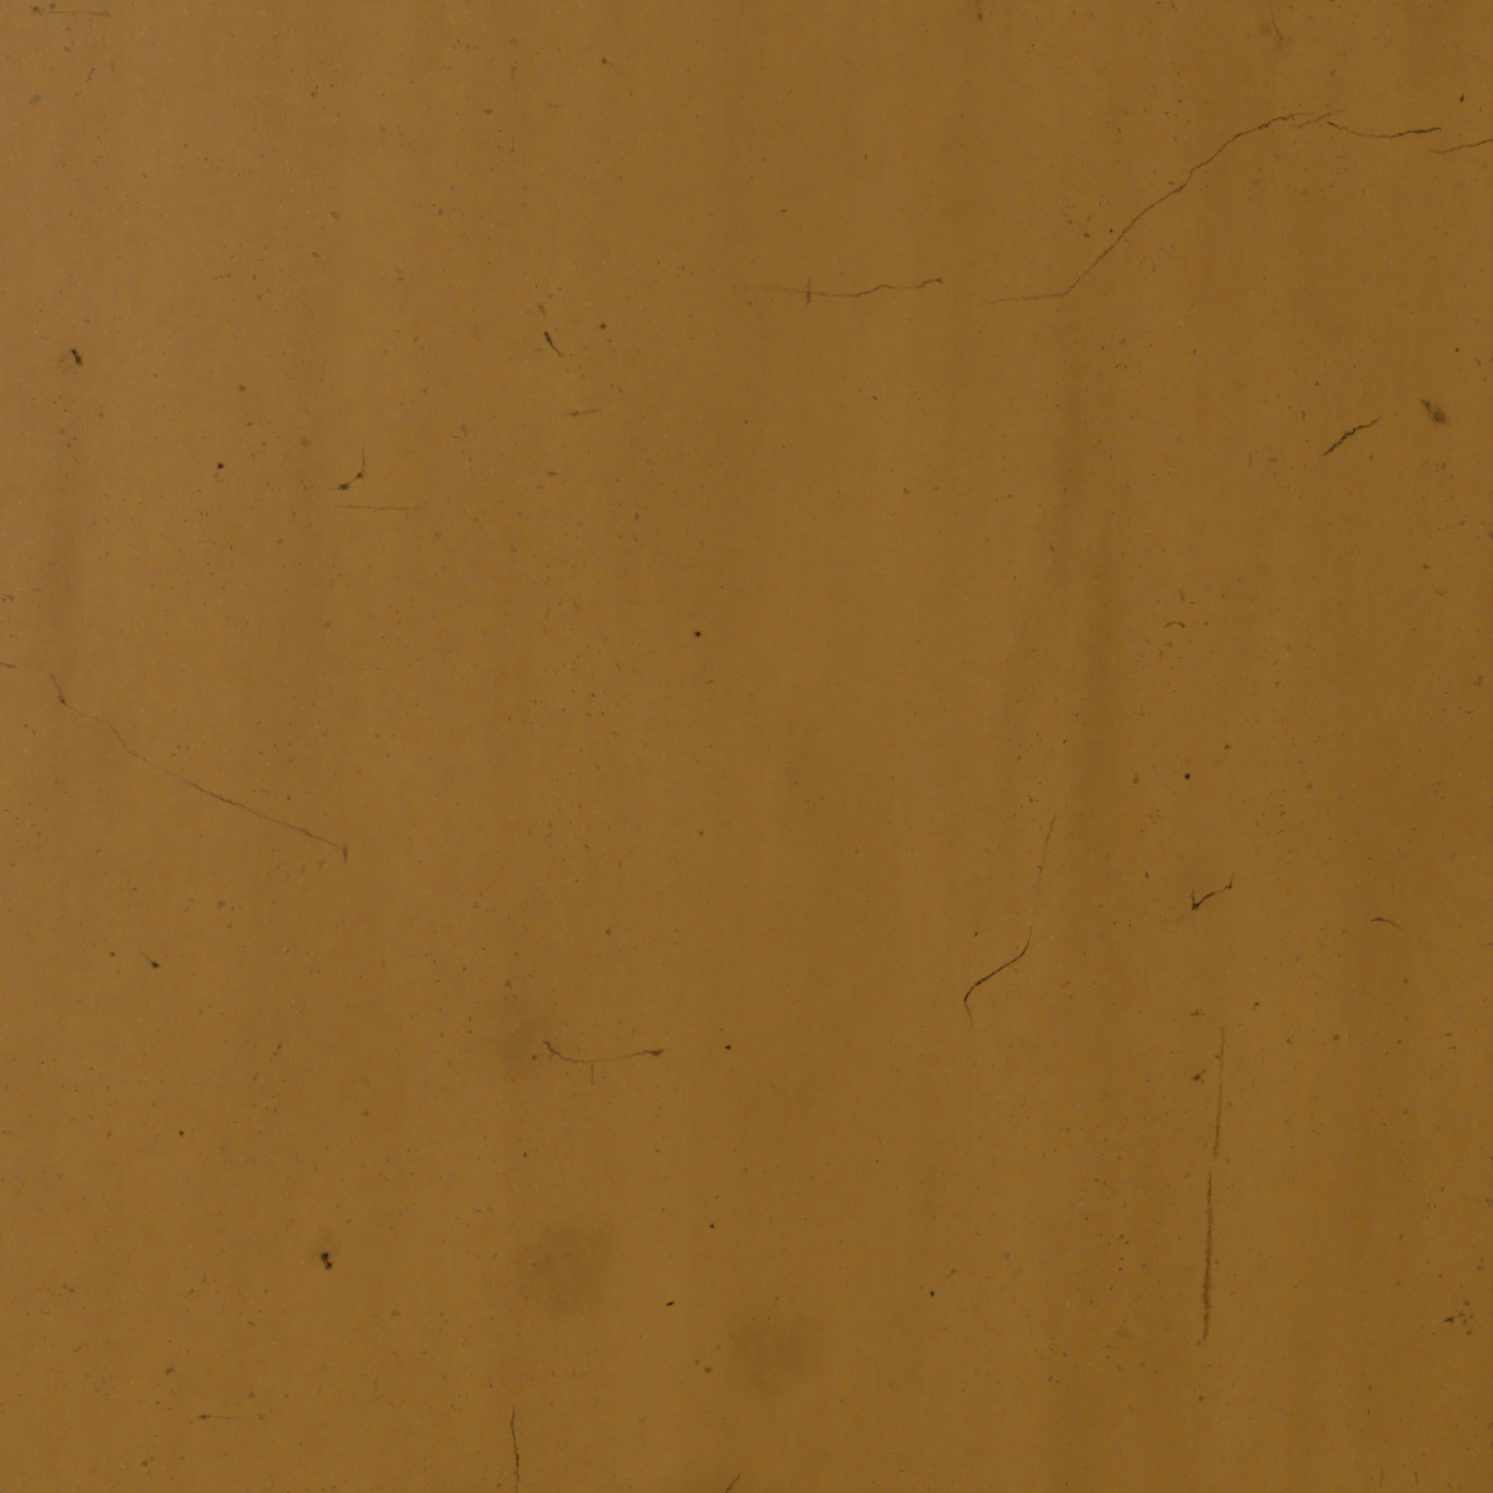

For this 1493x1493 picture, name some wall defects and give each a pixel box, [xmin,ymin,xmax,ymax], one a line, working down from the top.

crack [980,103,1493,312]
crack [1320,412,1384,459]
crack [958,922,1040,1032]